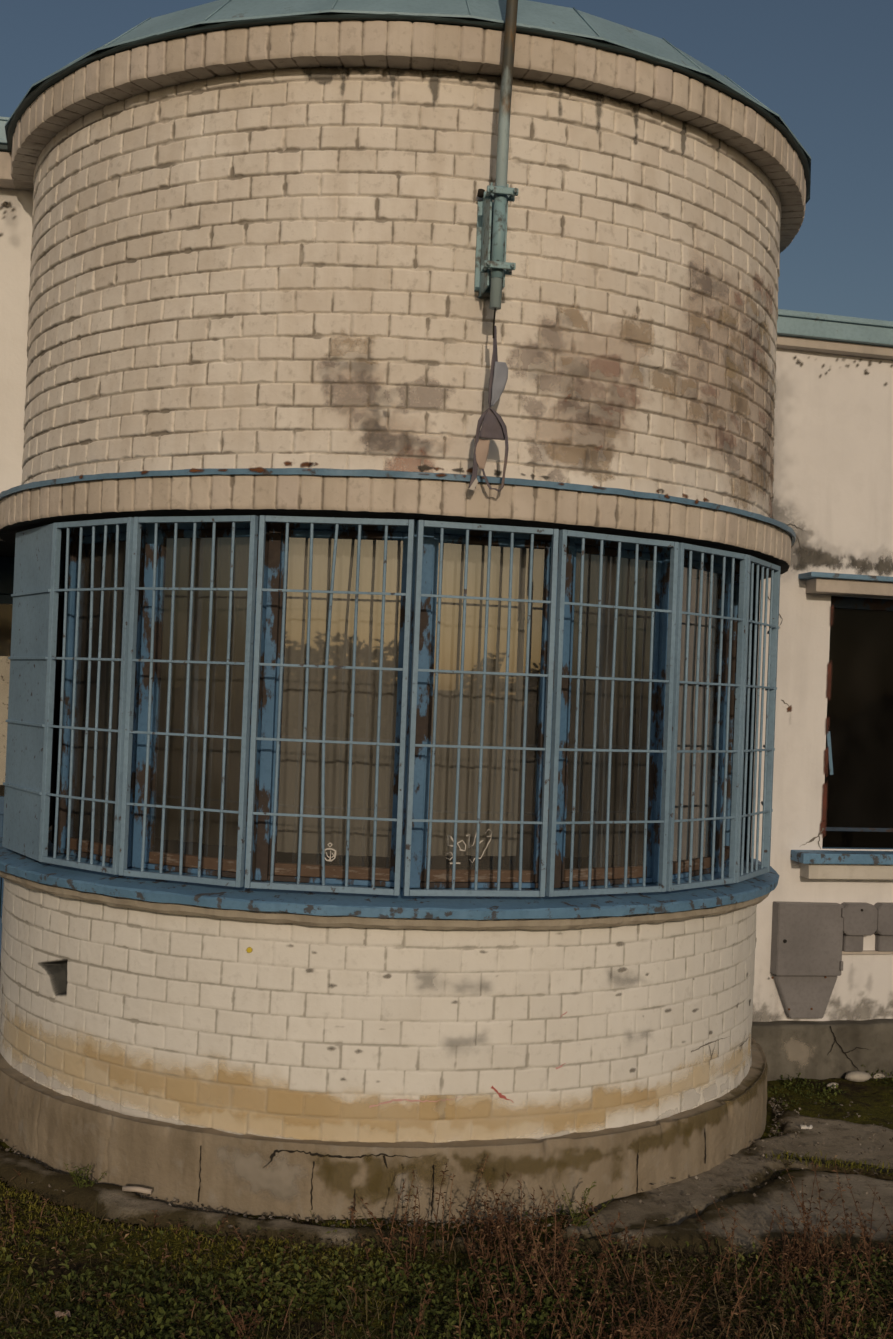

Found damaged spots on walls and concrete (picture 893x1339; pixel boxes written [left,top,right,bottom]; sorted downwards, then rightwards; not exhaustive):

leakage [794,547,893,576]
crack [827,1026,869,1071]
leakage [4,1017,752,1204]
crack [263,1150,436,1215]